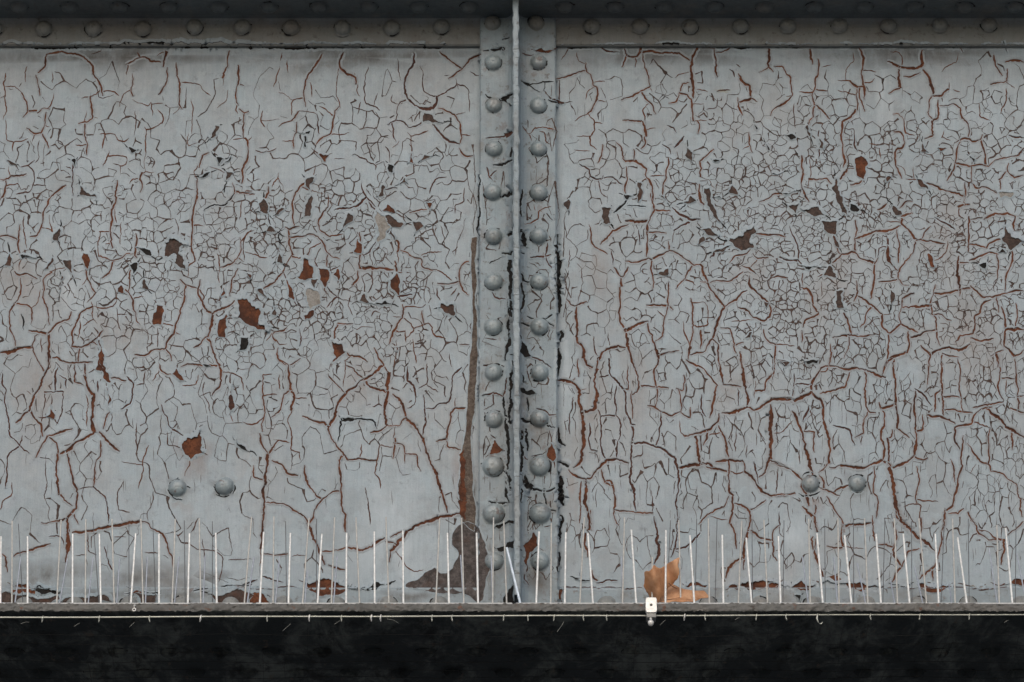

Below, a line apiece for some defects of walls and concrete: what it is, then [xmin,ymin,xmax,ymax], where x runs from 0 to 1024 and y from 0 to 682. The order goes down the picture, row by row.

peeling [852,151,872,183]
peeling [253,192,342,321]
peeling [659,179,759,254]
peeling [215,270,279,353]
crack [0,37,513,590]
crack [481,39,1024,592]
peeling [178,425,207,461]
peeling [299,235,542,604]
rust [450,422,465,507]